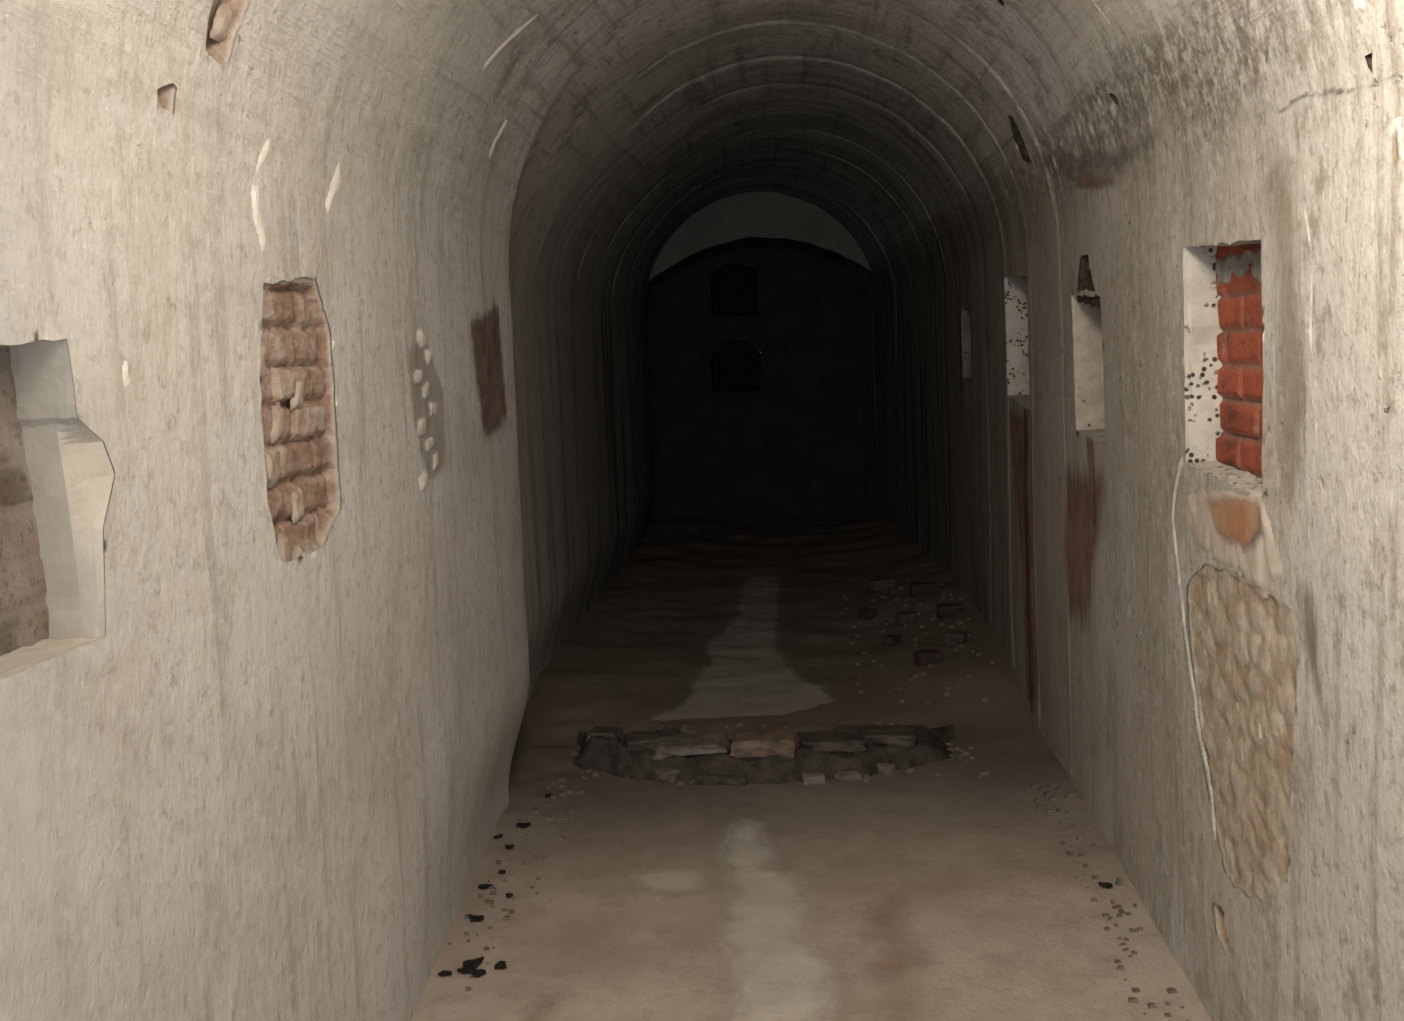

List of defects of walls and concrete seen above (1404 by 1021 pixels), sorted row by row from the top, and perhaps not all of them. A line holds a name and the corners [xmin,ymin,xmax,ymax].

spalling [206,0,251,68]
crack [1279,88,1352,112]
crack [1353,0,1365,15]
flaking render [259,277,342,562]
rust [1065,439,1100,619]
flaking render [1187,564,1298,902]